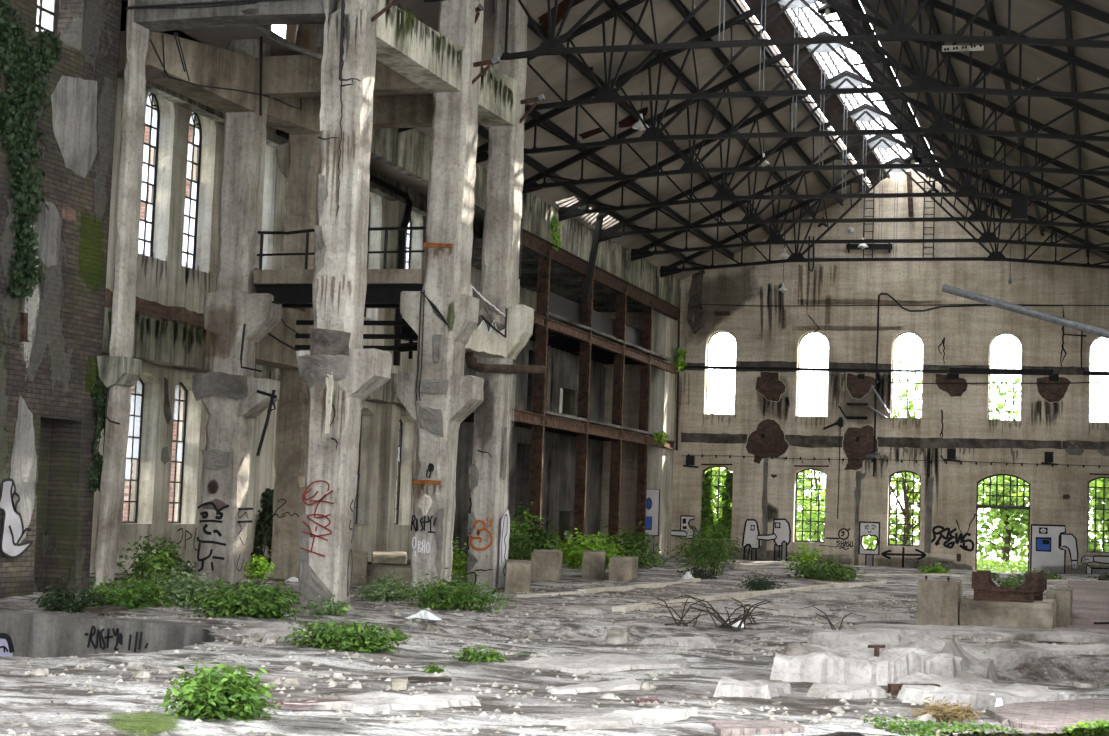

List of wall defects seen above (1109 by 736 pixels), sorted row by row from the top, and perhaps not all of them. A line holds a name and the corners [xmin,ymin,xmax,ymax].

damp [387,0,461,70]
flaking render [51,75,98,178]
flaking render [35,201,76,268]
damp [687,271,786,337]
damp [798,265,923,331]
flaking render [10,396,37,543]